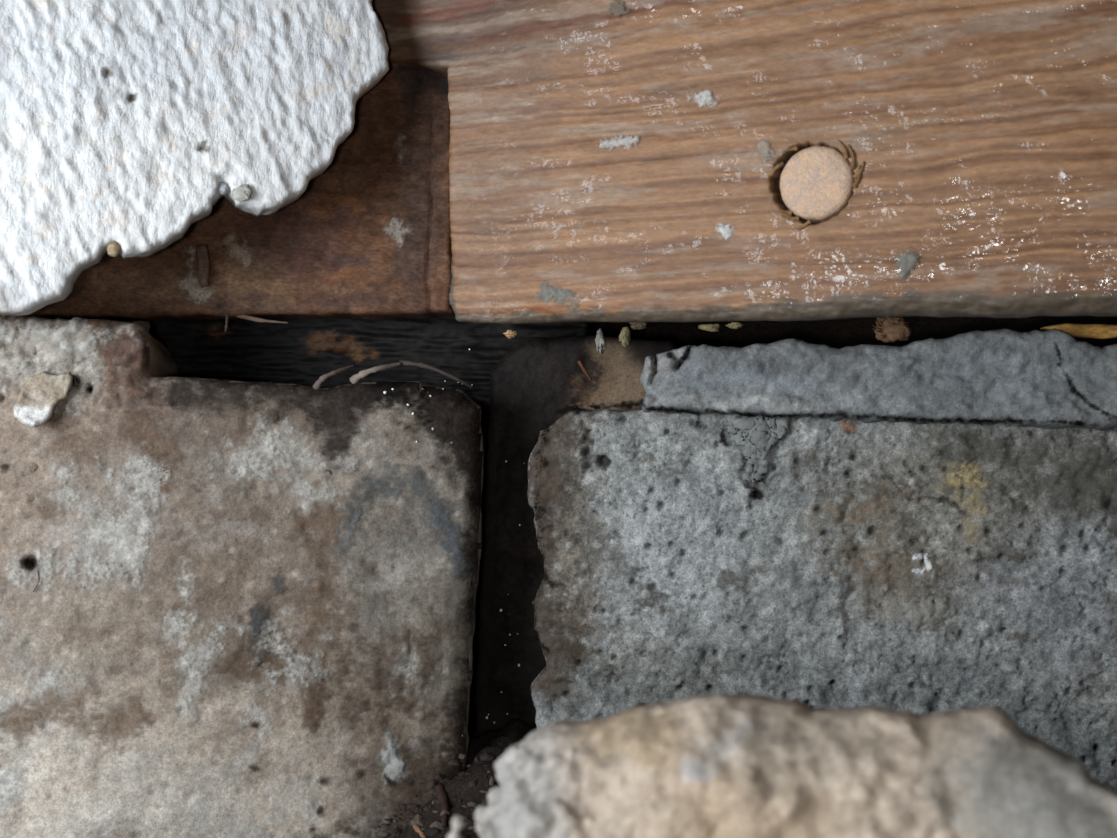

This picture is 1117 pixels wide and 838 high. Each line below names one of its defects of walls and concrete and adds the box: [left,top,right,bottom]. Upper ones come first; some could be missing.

water stain [6,456,170,591]
water stain [159,336,602,731]
crack [533,345,1109,670]
water stain [0,660,150,742]
water stain [237,704,272,744]
water stain [372,648,472,838]